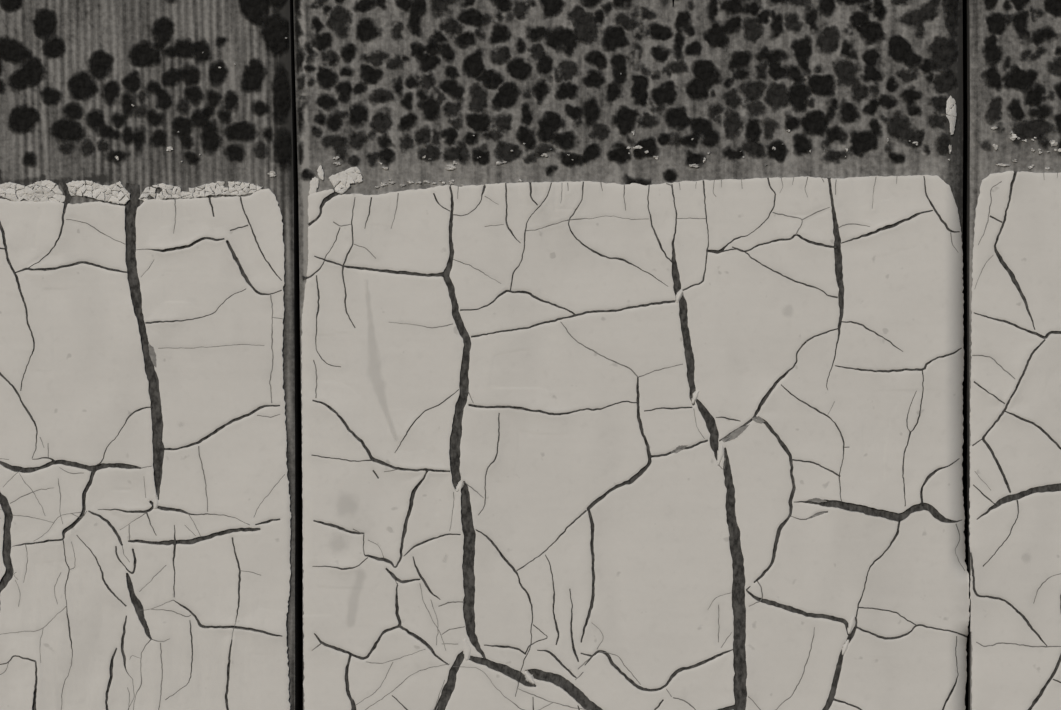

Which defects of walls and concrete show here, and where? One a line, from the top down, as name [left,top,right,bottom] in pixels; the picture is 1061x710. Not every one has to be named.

damp [0,0,959,185]
damp [982,0,1061,154]
peeling [0,180,262,204]
peeling [309,156,363,194]
peeling [946,95,957,161]
peeling [997,131,1061,169]
crack [0,171,1061,710]